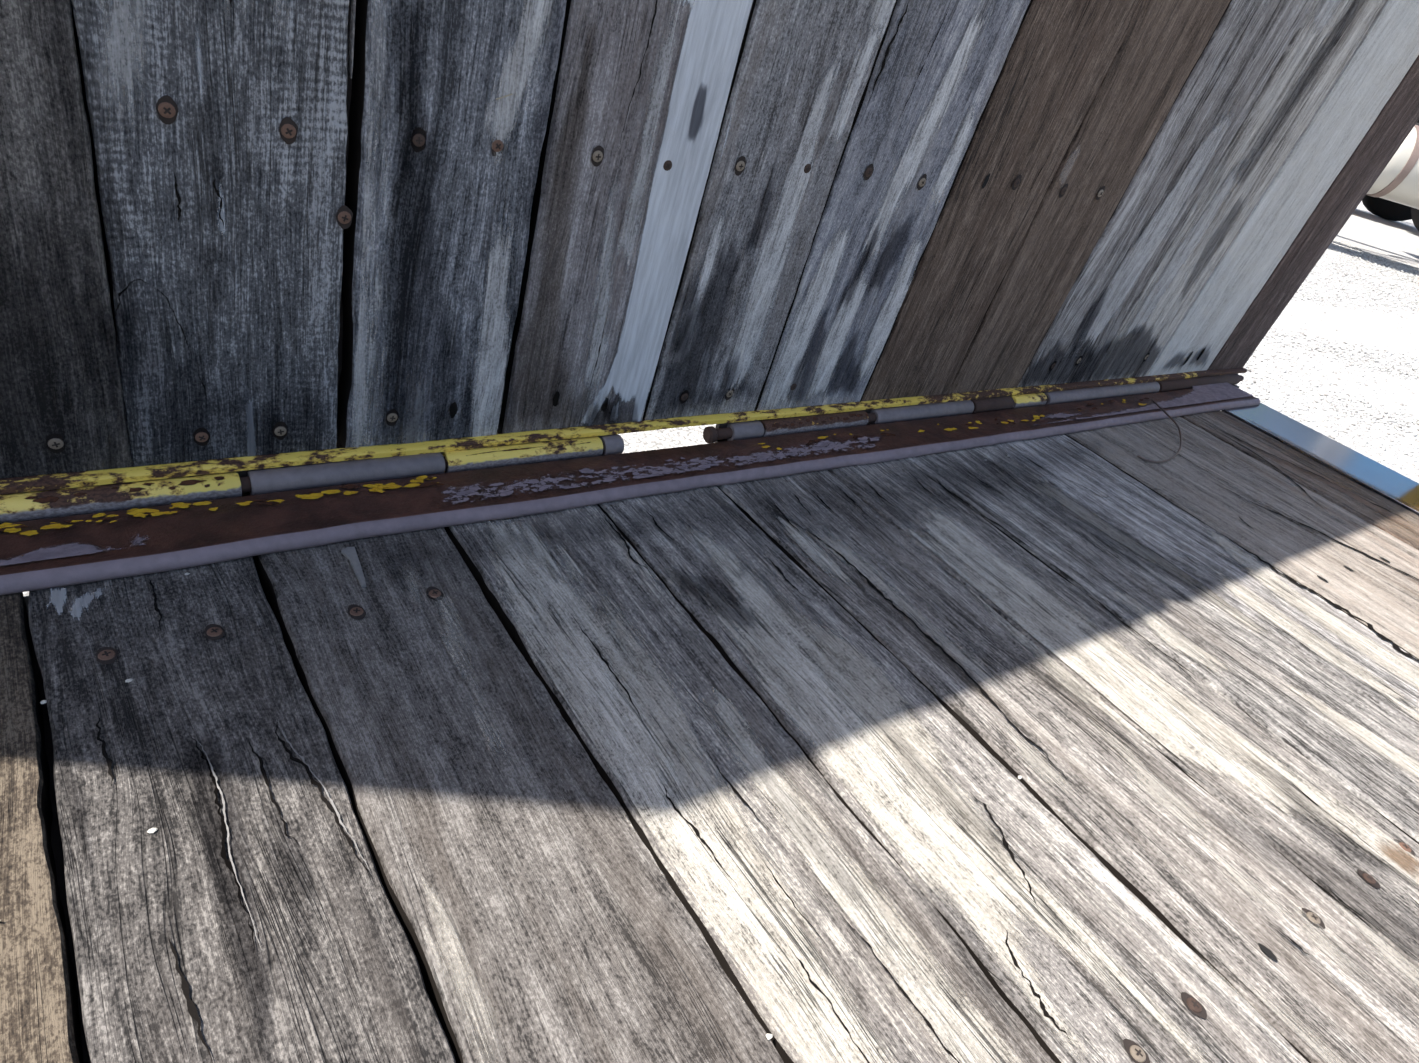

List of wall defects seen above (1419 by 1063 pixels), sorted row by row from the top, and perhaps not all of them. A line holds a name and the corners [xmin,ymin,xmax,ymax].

corrosion [24,493,86,504]
corrosion [112,476,225,492]
peeling [236,429,895,506]
peeling [0,501,218,566]
crack [147,578,162,630]
crack [96,717,114,786]
crack [248,719,372,880]
crack [190,734,260,957]
crack [168,937,212,1061]